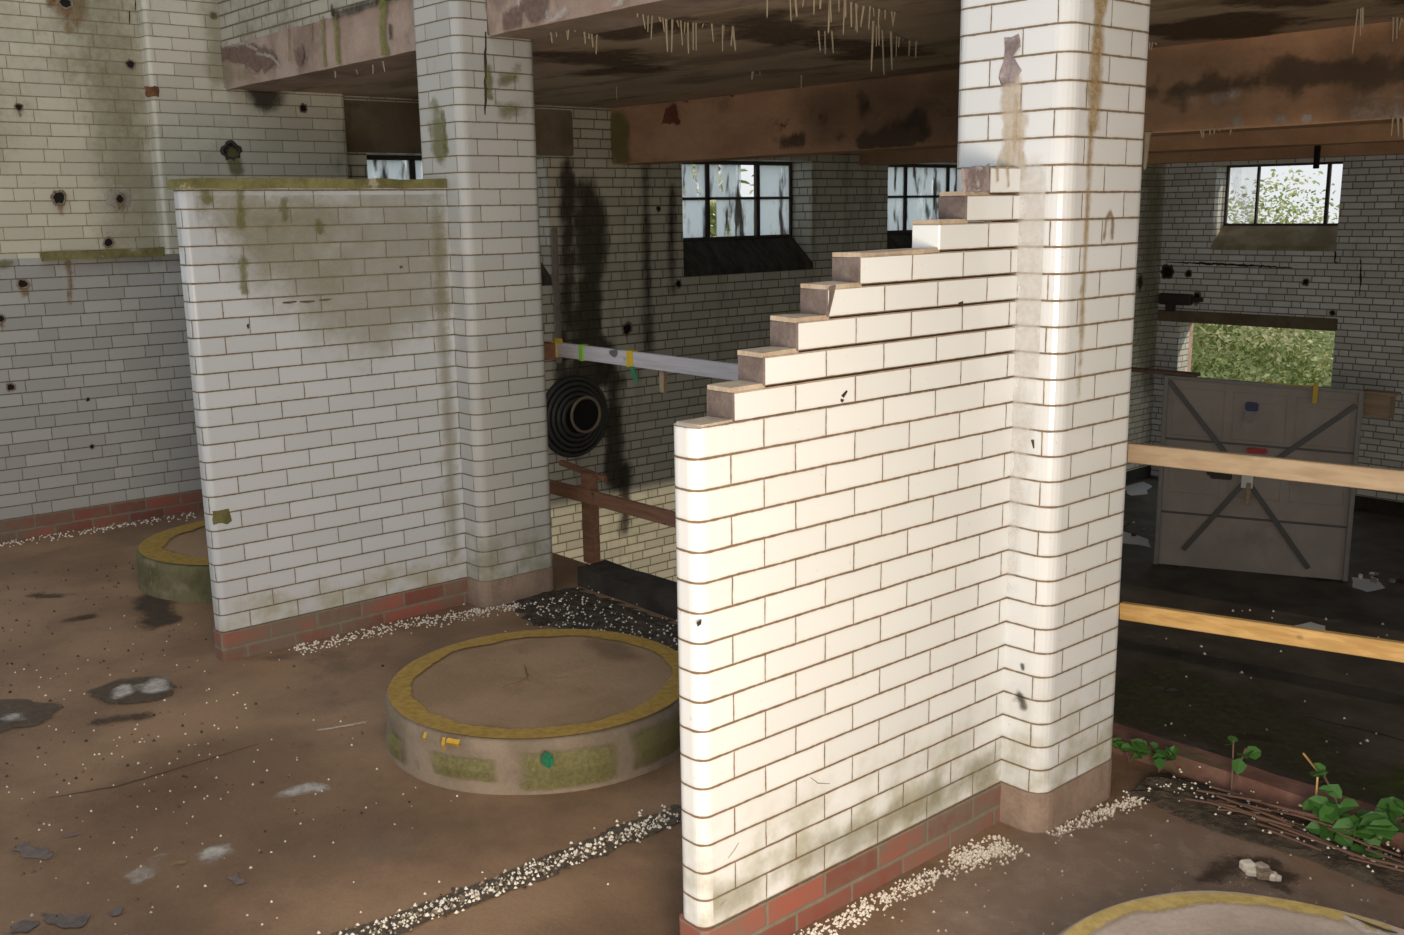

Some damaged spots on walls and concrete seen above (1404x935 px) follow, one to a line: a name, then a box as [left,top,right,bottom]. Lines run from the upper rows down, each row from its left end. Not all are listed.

peeling [503,0,547,30]
peeling [220,43,276,74]
spalling [999,34,1022,86]
corrosion [1081,0,1114,337]